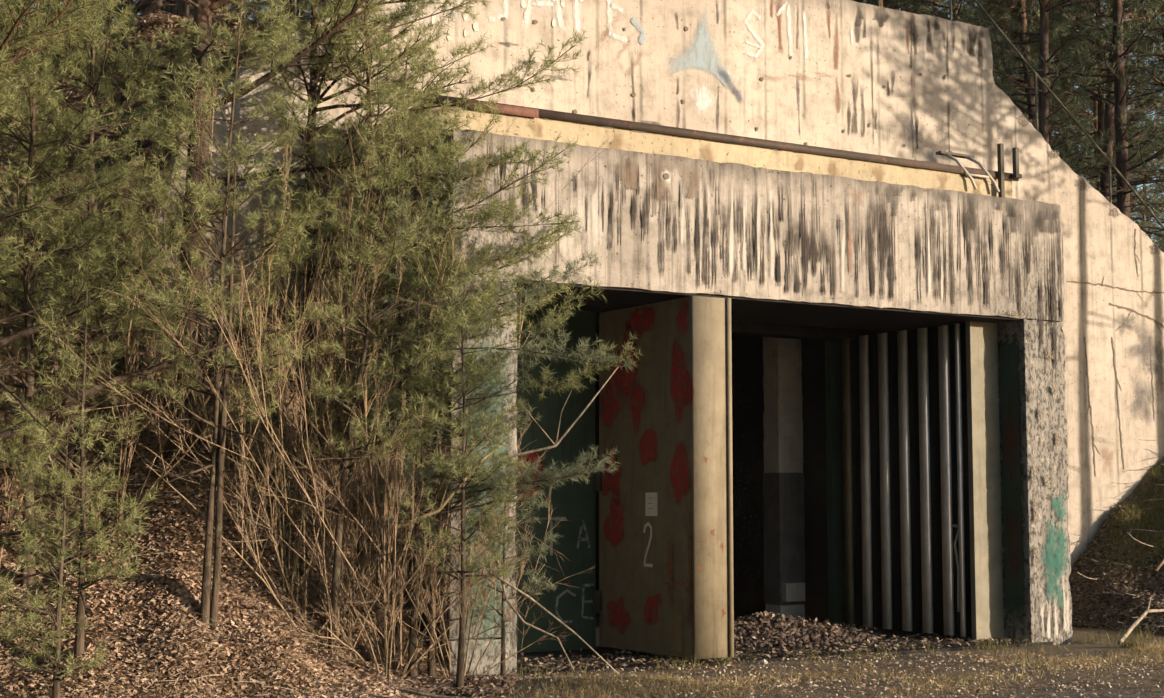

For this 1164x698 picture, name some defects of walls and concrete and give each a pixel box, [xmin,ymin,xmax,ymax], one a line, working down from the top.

damp [855,12,888,43]
damp [910,23,982,70]
damp [848,63,877,139]
damp [911,111,919,153]
damp [489,146,559,224]
damp [575,161,1064,381]
crack [1067,229,1164,476]